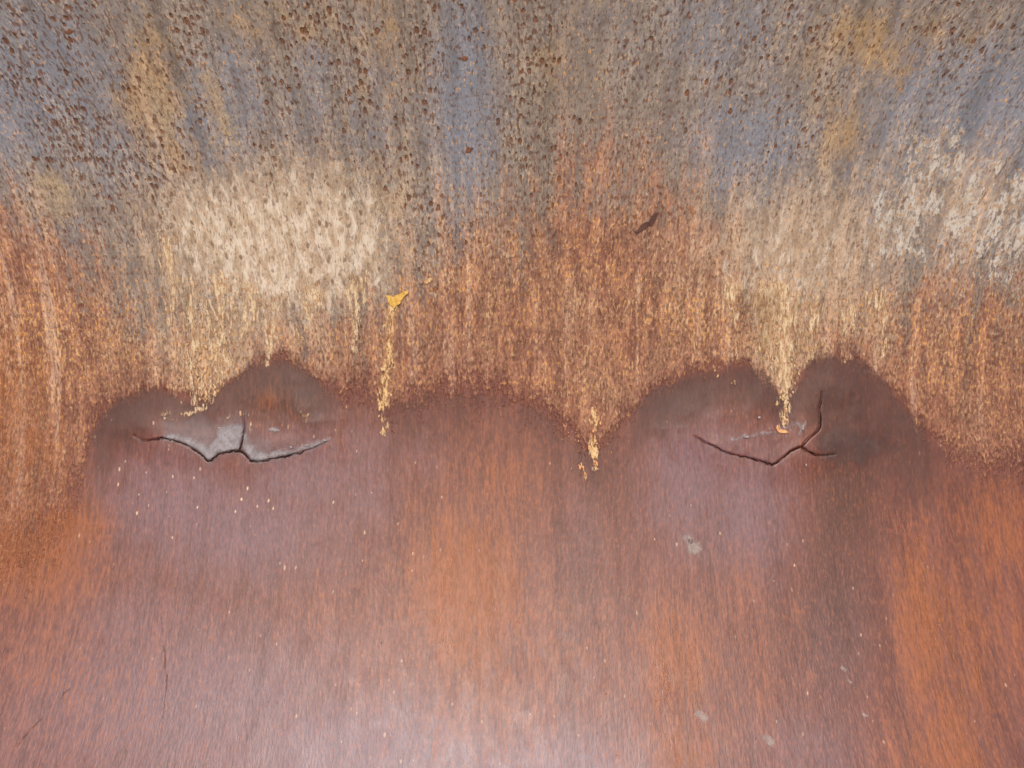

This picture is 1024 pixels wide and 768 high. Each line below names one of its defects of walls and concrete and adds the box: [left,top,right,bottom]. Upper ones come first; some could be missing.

rust [376,306,399,436]
crack [134,416,324,462]
rust [568,407,612,480]
crack [699,395,834,465]